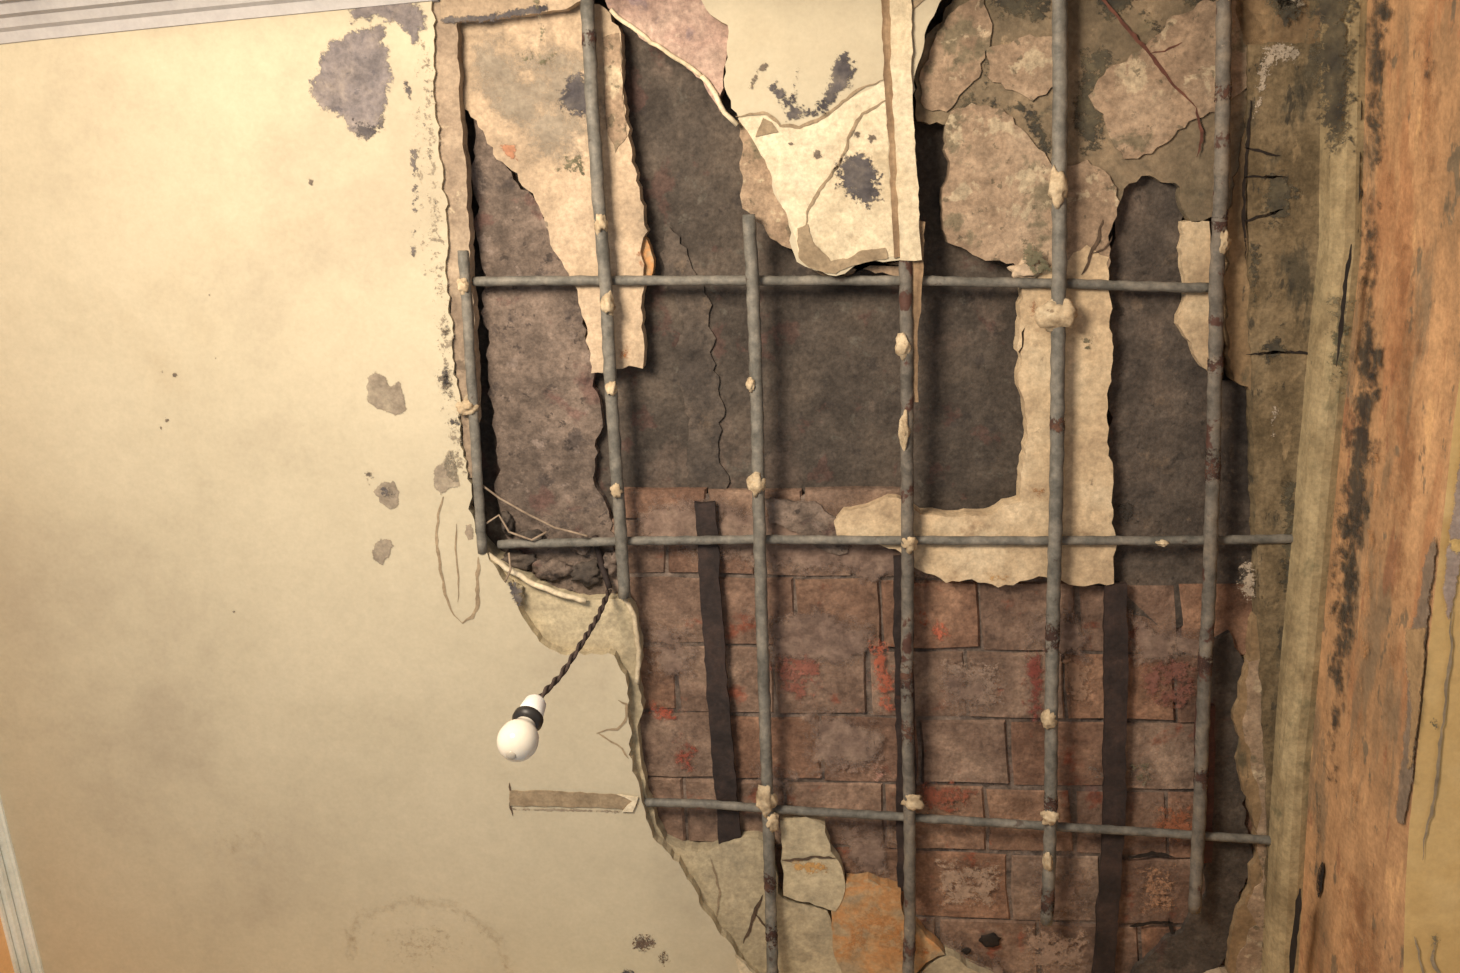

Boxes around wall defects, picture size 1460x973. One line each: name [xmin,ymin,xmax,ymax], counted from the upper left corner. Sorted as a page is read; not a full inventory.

water stain [308,0,586,175]
water stain [1253,0,1393,171]
spalling [404,0,1321,973]
corrosion [1049,417,1065,434]
water stain [1326,194,1382,782]
crack [435,497,480,624]
corrosion [1045,615,1061,652]
water stain [1237,556,1259,603]
crack [1423,611,1453,858]
corrosion [1044,792,1058,813]
corrosion [765,926,778,950]
crack [1414,937,1441,973]